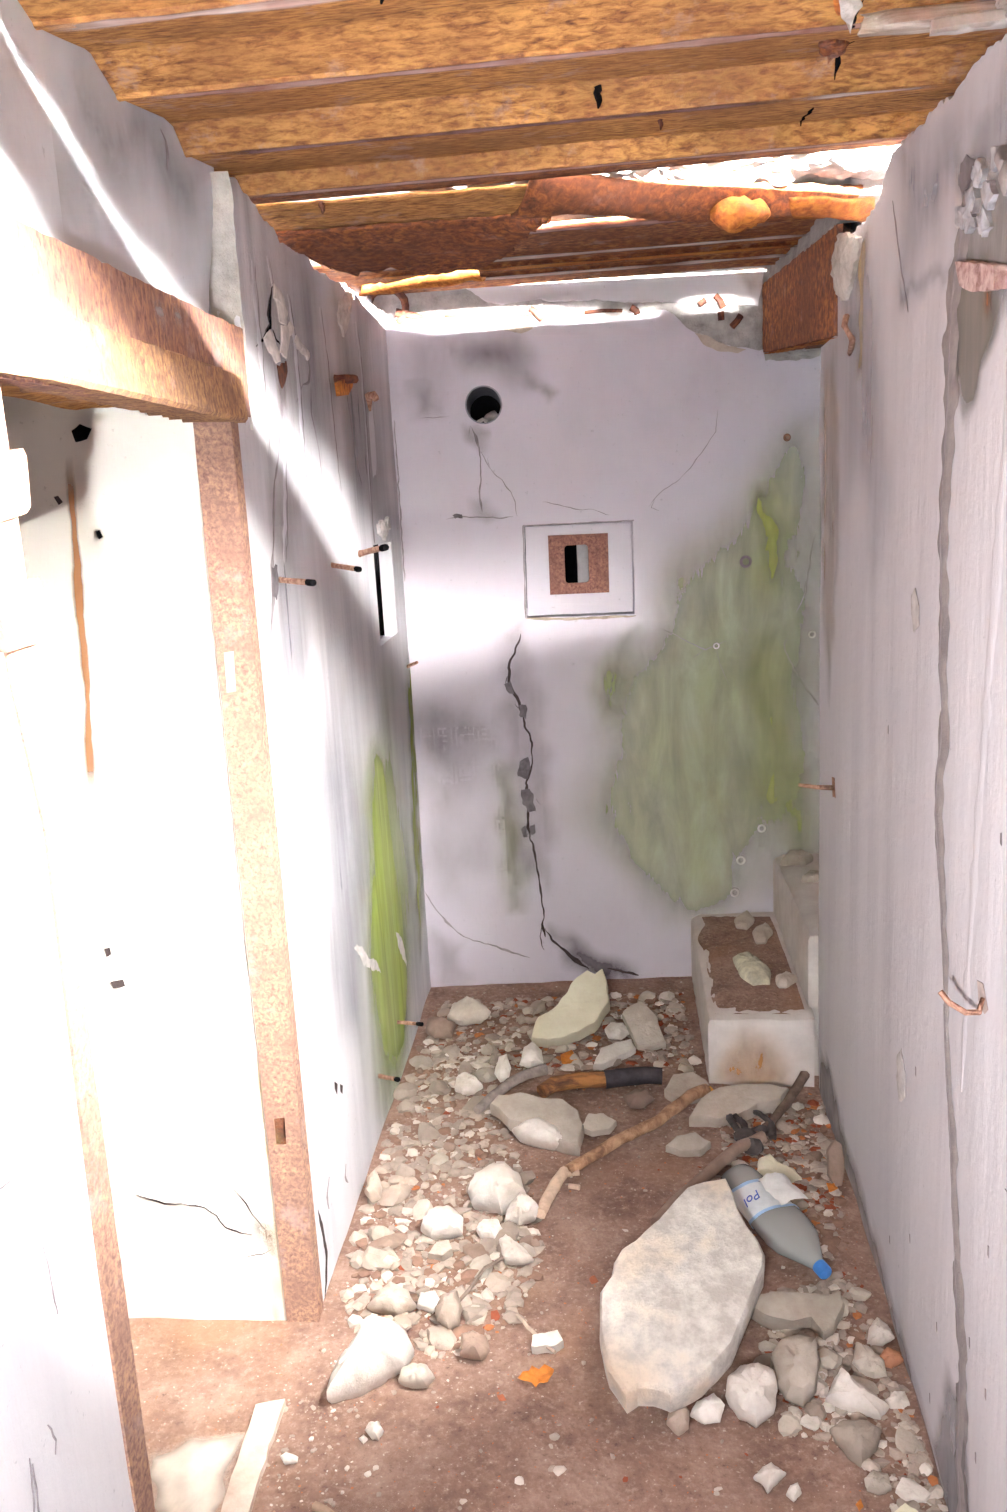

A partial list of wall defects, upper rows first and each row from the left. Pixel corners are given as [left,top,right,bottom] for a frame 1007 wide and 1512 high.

spalling [592,144,901,187]
corrosion [789,196,875,223]
spalling [955,145,1007,237]
corrosion [358,270,486,297]
spalling [209,171,770,562]
crack [424,634,639,978]
crack [136,1188,270,1257]